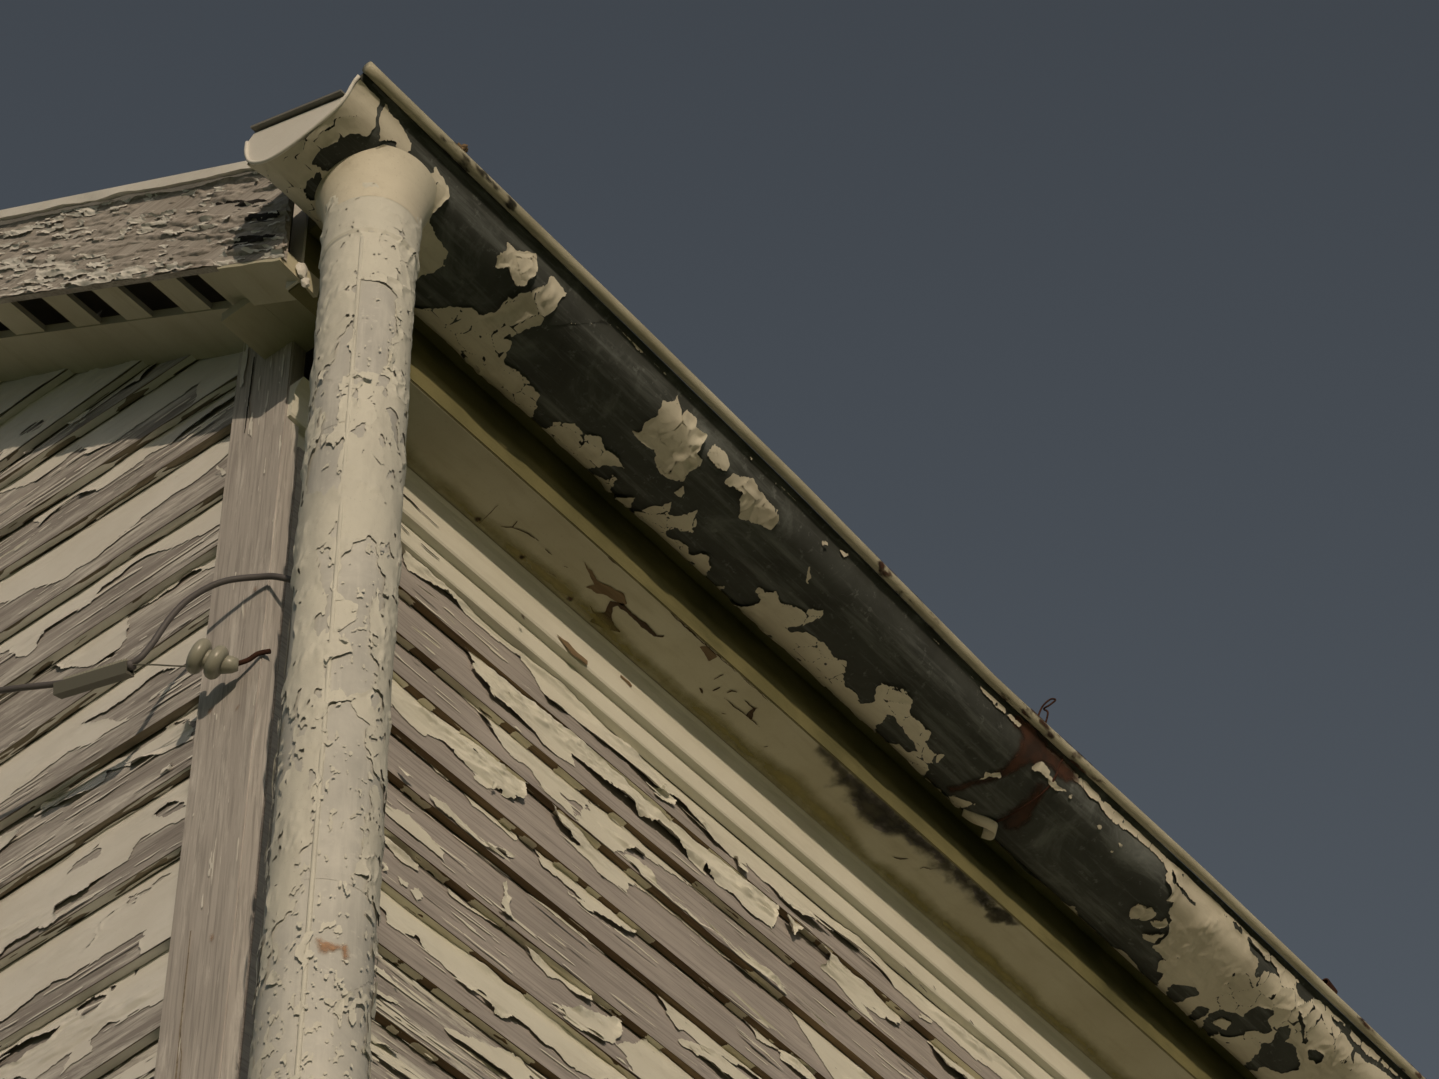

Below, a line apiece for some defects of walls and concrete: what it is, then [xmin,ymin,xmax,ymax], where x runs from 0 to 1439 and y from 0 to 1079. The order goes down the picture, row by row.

peeling [0,186,284,296]
peeling [0,355,234,571]
peeling [0,455,228,753]
peeling [260,83,1398,1079]
peeling [0,801,185,959]
peeling [0,664,202,888]
rust [948,708,1105,792]
peeling [0,932,163,1079]